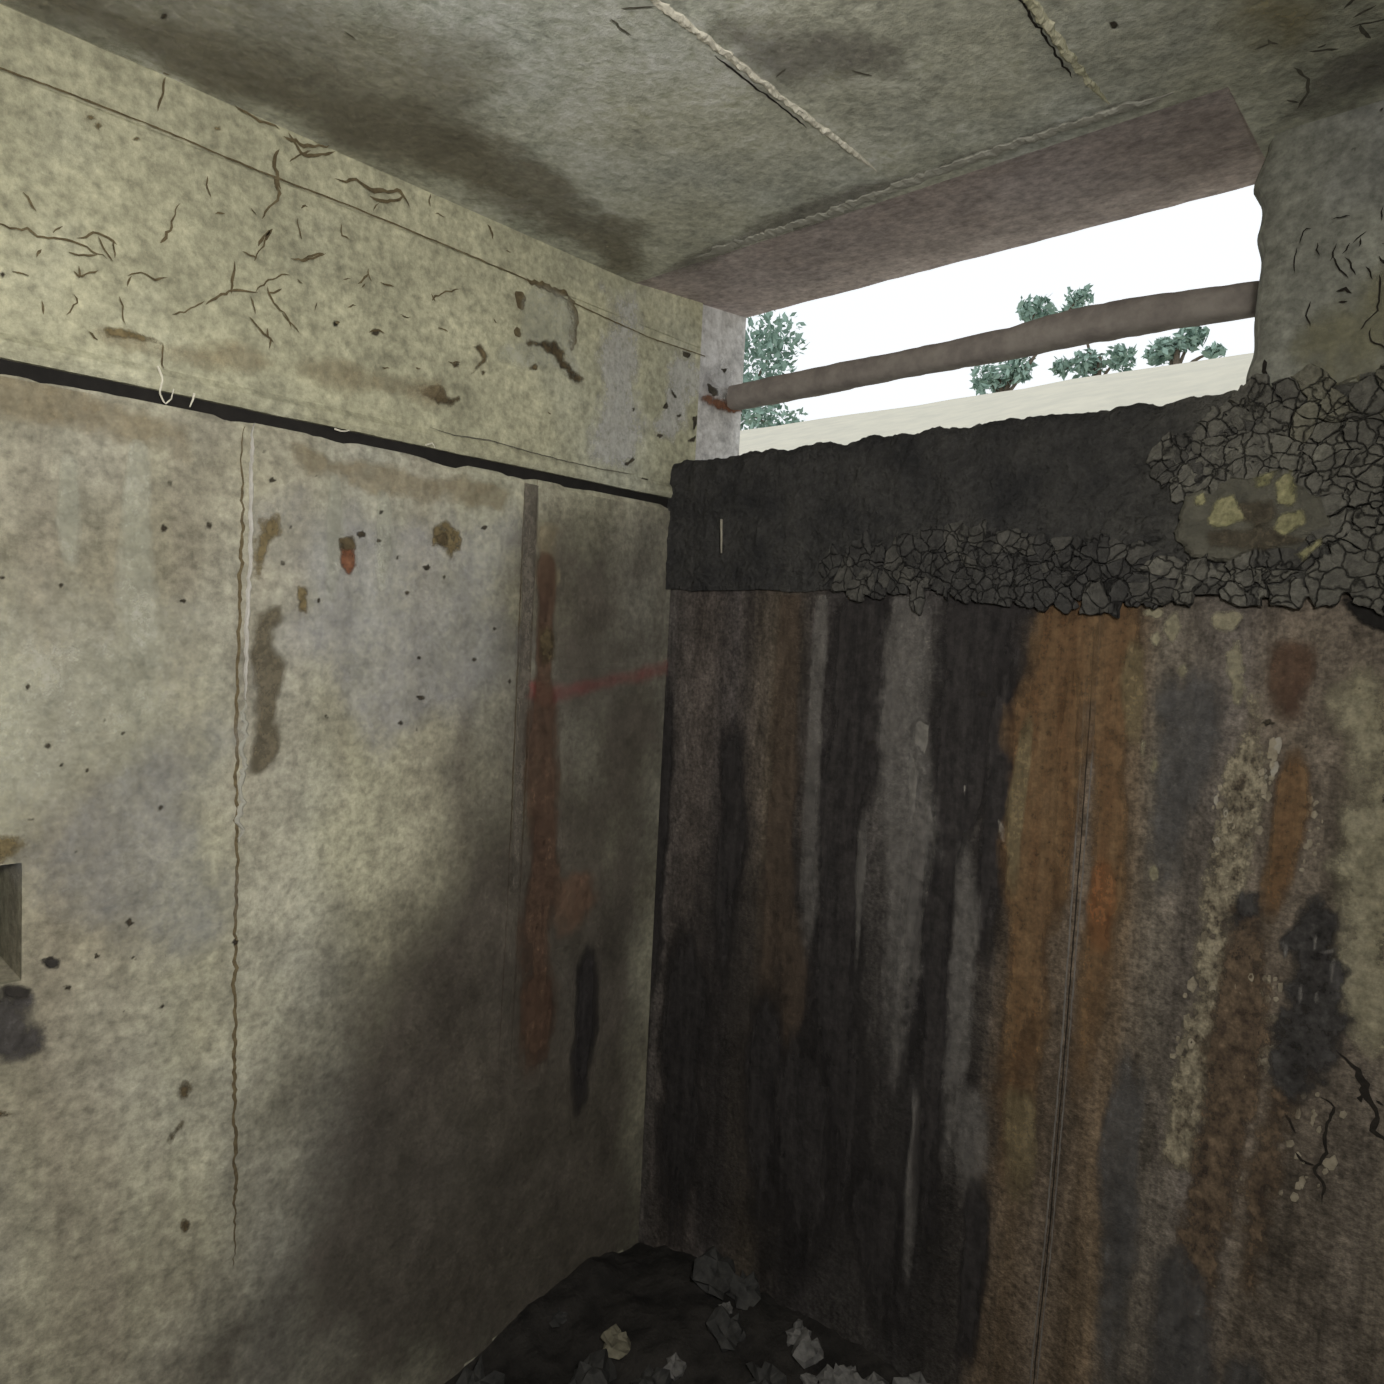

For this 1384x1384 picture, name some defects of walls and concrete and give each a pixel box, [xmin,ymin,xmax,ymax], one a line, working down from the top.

crack [1019,0,1072,78]
crack [716,57,805,126]
crack [0,67,705,357]
peeling [514,278,583,382]
crack [818,208,1384,618]
rust [1002,601,1102,1184]
damp [42,958,59,968]
damp [0,986,45,1061]
crack [1285,1052,1384,1200]